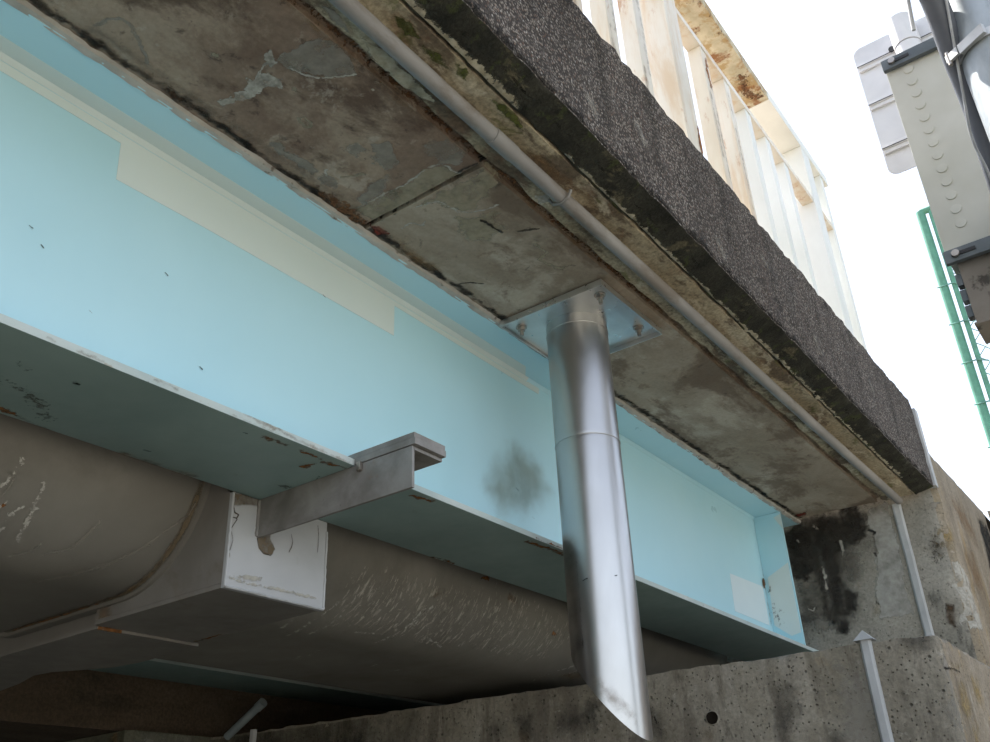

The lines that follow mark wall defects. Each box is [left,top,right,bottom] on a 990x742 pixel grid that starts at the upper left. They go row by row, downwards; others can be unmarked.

leakage [30,0,150,78]
leakage [217,50,283,106]
peeling [366,43,435,102]
peeling [405,0,518,109]
corrosion [738,74,764,100]
leakage [169,89,262,156]
crack [430,155,487,190]
leakage [270,140,507,320]
peeling [565,154,902,478]
peeling [0,481,46,543]
leakage [614,390,867,635]
leakage [979,520,990,563]